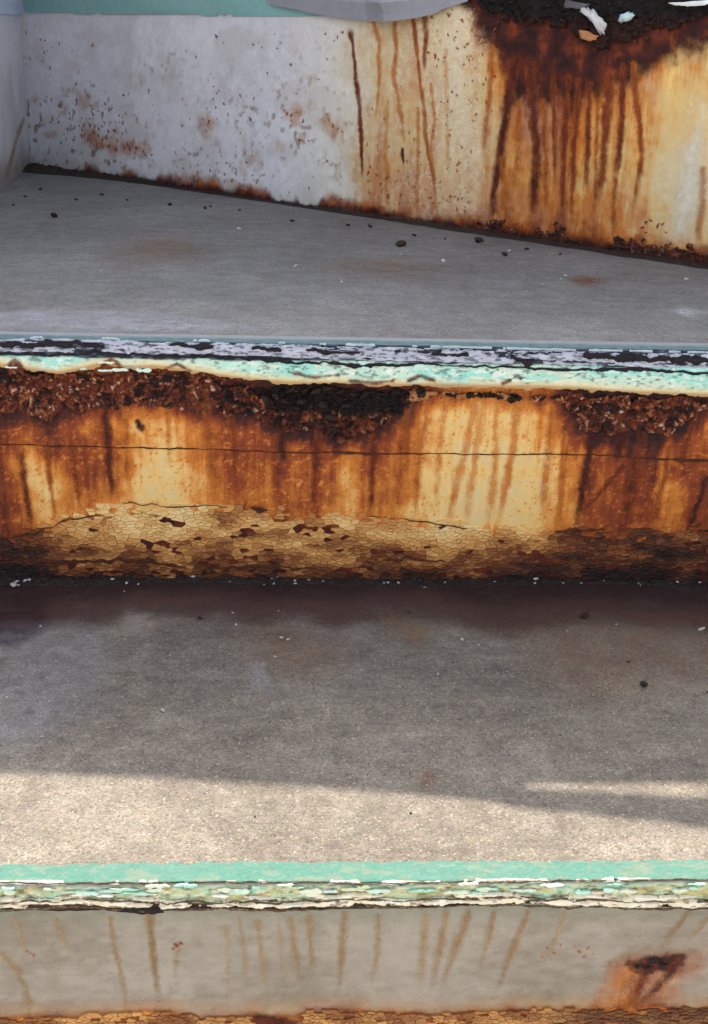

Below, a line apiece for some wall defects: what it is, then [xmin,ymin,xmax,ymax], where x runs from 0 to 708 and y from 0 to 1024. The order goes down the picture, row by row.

rust [317,0,708,263]
rust [116,170,300,204]
rust [76,364,123,377]
spalling [0,336,708,444]
crack [0,444,708,462]
rust [0,368,708,545]
crack [0,502,708,583]
peeling [0,877,708,909]
rust [250,1009,377,1024]
rust [592,954,685,1024]